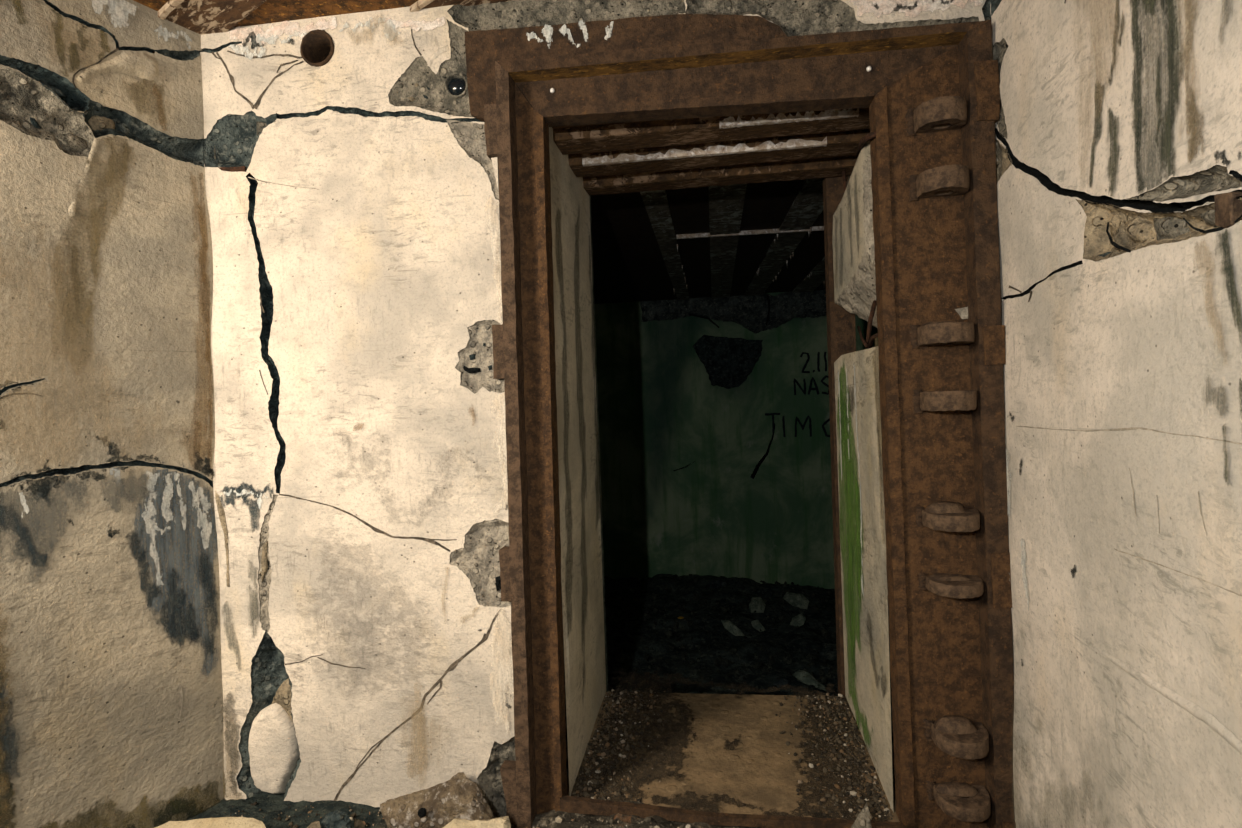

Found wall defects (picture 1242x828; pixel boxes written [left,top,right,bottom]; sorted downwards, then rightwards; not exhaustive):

crack [0,0,483,124]
spalling [229,0,1012,200]
water stain [1089,0,1202,196]
crack [995,124,1242,252]
water stain [1218,230,1242,337]
crack [246,177,457,552]
spalling [455,320,504,394]
crack [0,460,213,488]
water stain [0,442,278,676]
spalling [449,505,511,607]
water stain [39,693,239,828]
flaking render [236,630,301,799]